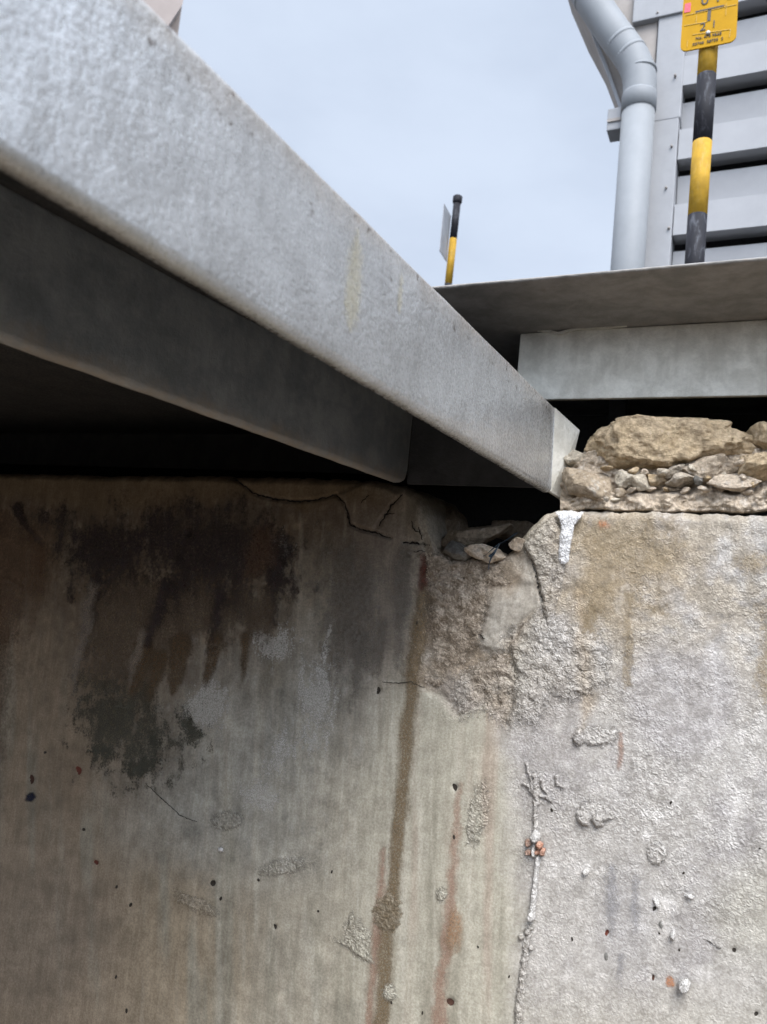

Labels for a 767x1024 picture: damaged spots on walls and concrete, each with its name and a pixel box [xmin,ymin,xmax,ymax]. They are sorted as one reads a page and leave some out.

spalling [565,416,609,453]
spalling [646,414,767,432]
crack [234,478,430,553]
peeling [597,464,758,502]
peeling [0,464,614,739]
water stain [39,494,430,1024]
corrosion [433,808,462,1024]